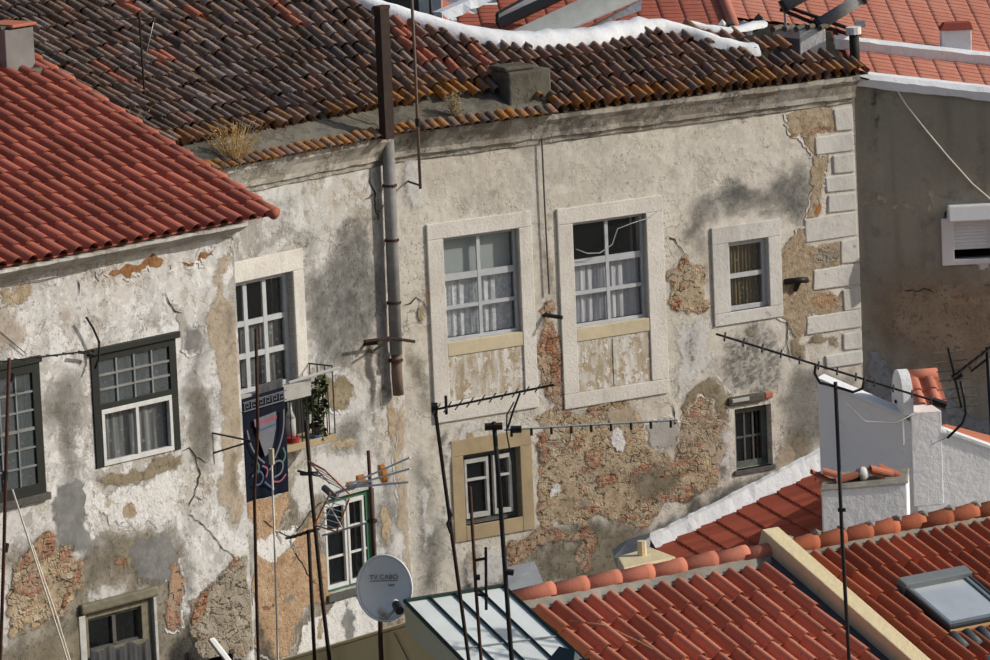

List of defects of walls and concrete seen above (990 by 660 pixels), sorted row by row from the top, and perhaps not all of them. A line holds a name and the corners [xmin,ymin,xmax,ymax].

flaking render [665,254,710,314]
leakage [693,166,813,233]
flaking render [776,106,845,359]
peeling [724,322,780,393]
crack [184,447,235,558]
flaking render [95,244,368,660]
flaking render [466,299,729,587]
flaking render [0,508,85,640]